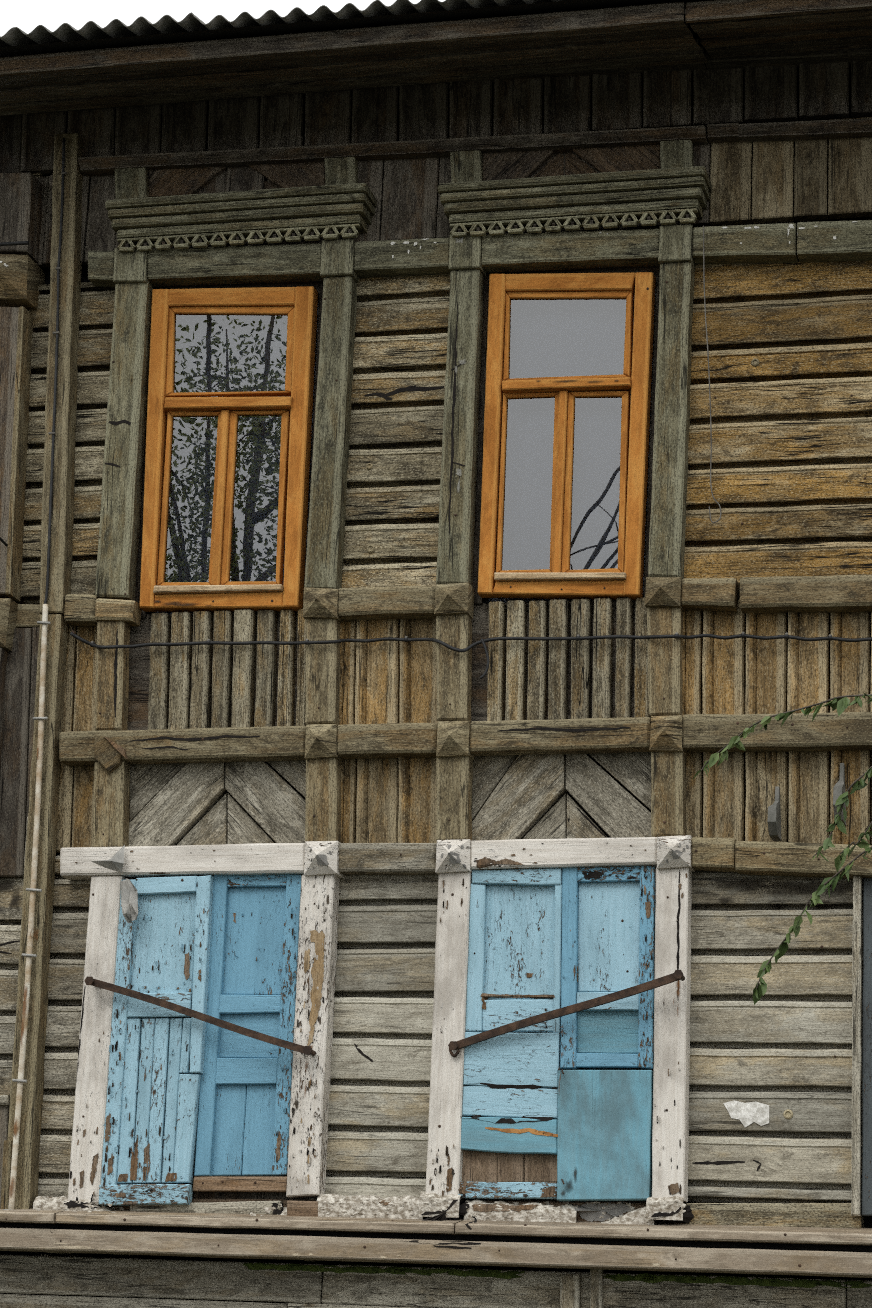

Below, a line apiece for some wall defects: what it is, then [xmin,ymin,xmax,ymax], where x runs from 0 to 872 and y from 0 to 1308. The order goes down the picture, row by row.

peeling [35,1009,187,1213]
peeling [122,909,206,1002]
peeling [275,895,329,1188]
peeling [439,843,544,923]
peeling [481,981,563,1037]
peeling [582,843,689,1067]